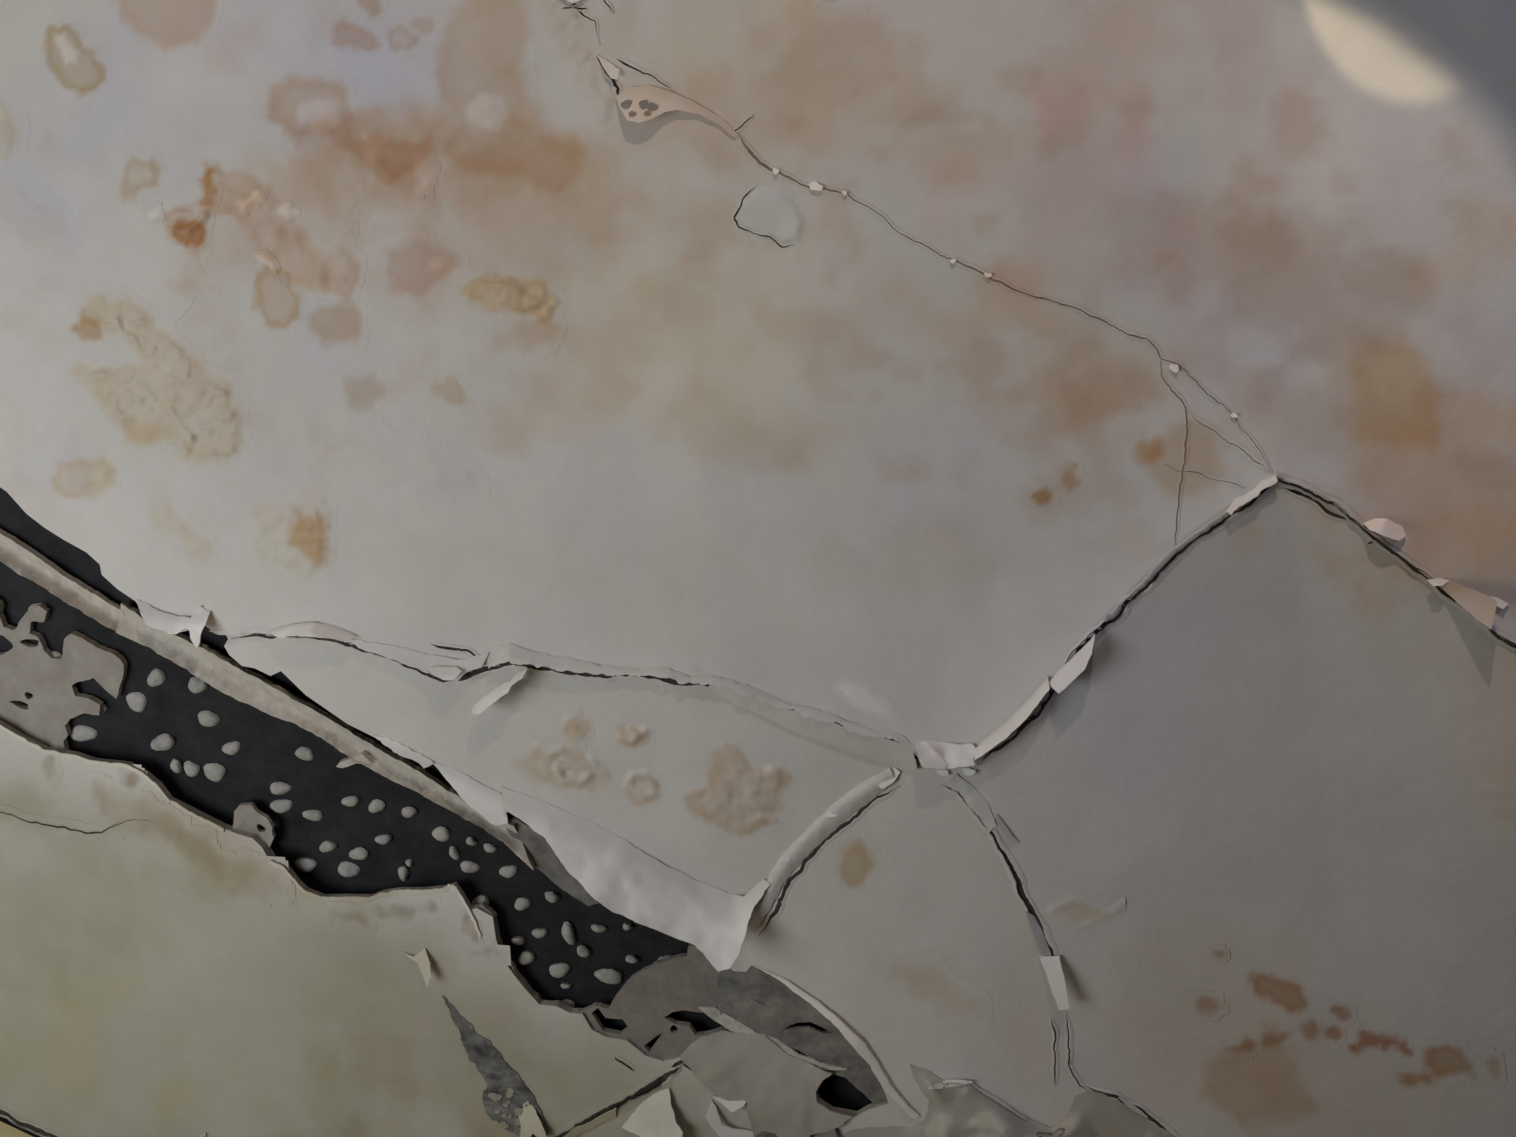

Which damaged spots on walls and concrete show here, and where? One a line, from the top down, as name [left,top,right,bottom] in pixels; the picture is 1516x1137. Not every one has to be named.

damp [102,0,224,56]
damp [259,0,609,203]
peeling [561,0,754,137]
damp [113,150,168,212]
damp [374,226,470,310]
peeling [732,185,794,249]
damp [246,259,391,421]
damp [1123,405,1243,508]
crack [231,134,1516,956]
spalling [0,488,1180,1137]
crack [547,1056,696,1137]
corrosion [1186,944,1507,1137]